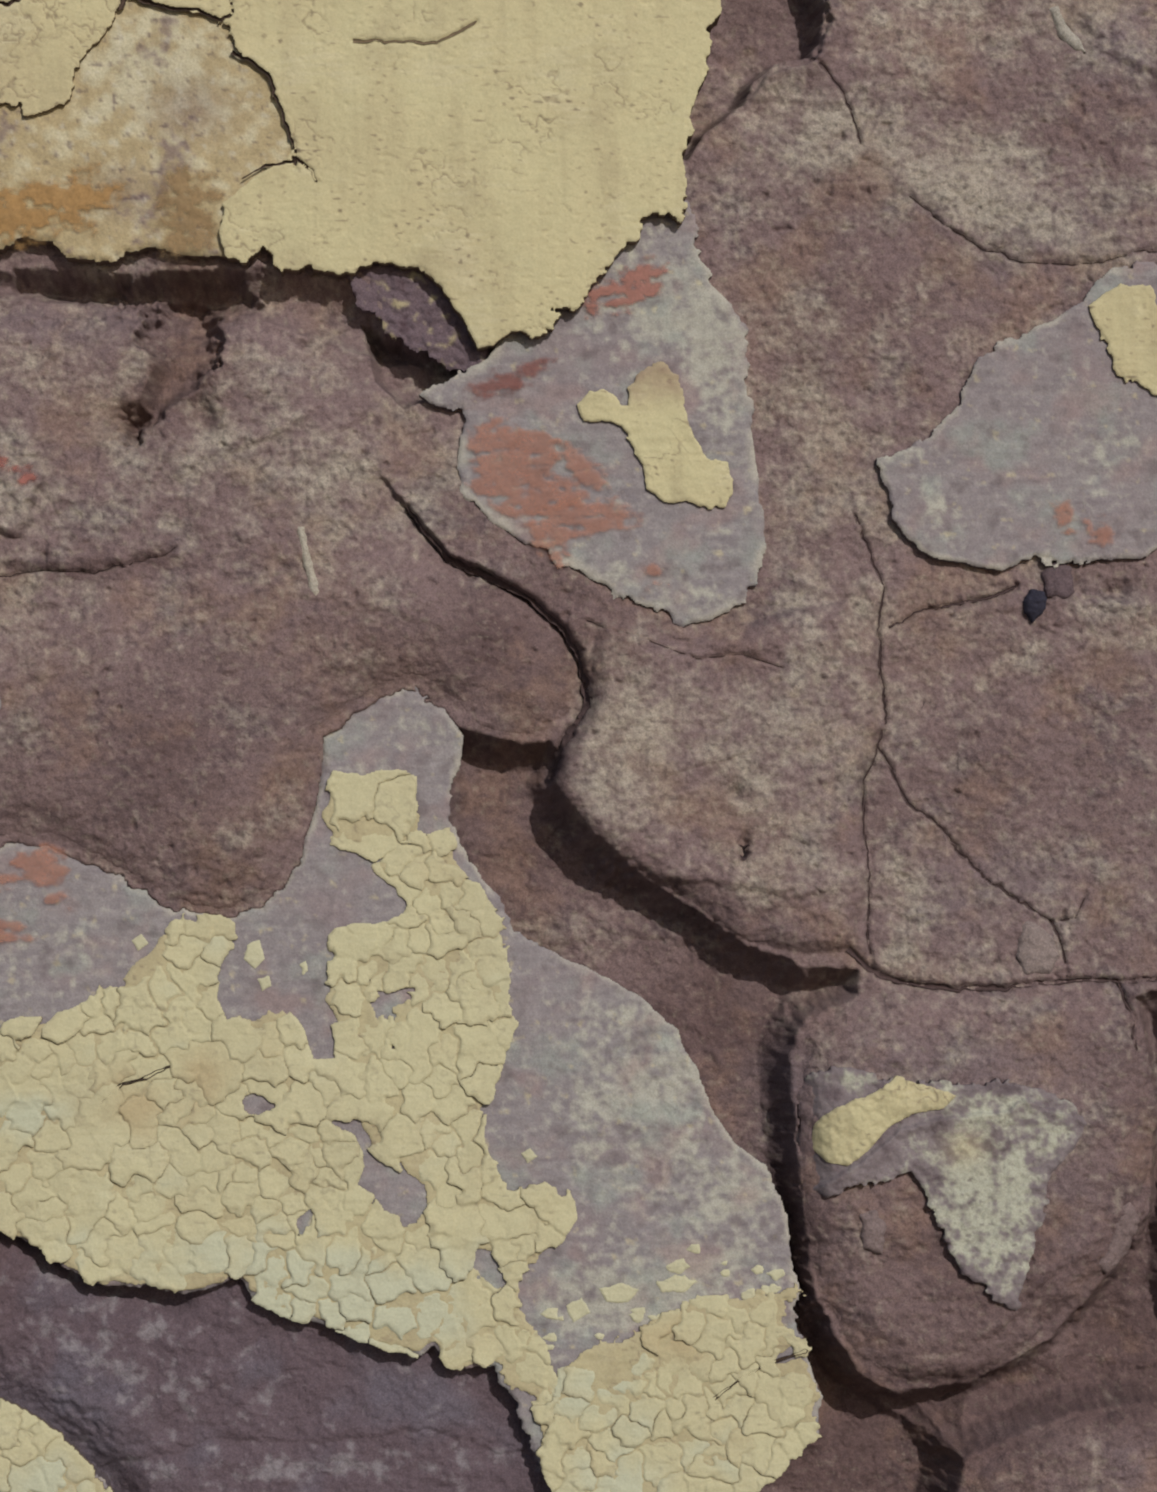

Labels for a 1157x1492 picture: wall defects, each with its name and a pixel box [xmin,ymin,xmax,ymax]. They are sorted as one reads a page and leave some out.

crack [0,0,21,8]
crack [118,0,317,182]
crack [353,21,477,45]
flaking render [0,0,766,627]
flaking render [875,260,1157,599]
crack [406,507,782,781]
crack [846,514,1157,1051]
peeling [0,686,823,1492]
flaking render [796,1066,1087,1311]